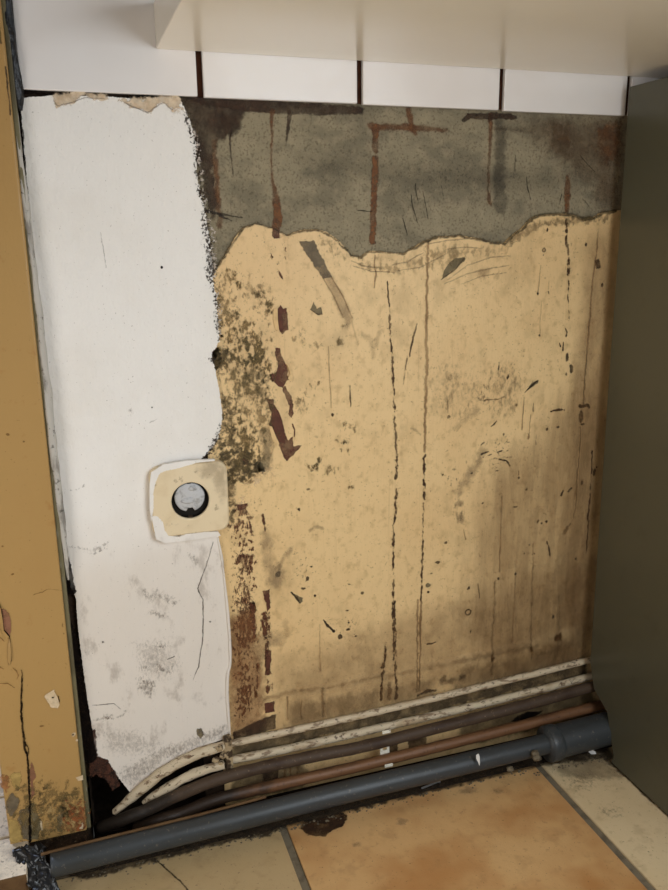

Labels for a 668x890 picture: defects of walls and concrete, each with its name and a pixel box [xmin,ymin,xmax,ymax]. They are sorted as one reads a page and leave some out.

water stain [180,97,244,228]
rust [180,97,364,230]
spalling [121,96,628,341]
rust [368,107,448,245]
rust [462,112,517,156]
water stain [212,269,276,527]
peeling [265,348,302,461]
peeling [0,606,17,672]
crack [195,544,213,674]
rust [228,502,276,739]
crack [20,670,32,843]